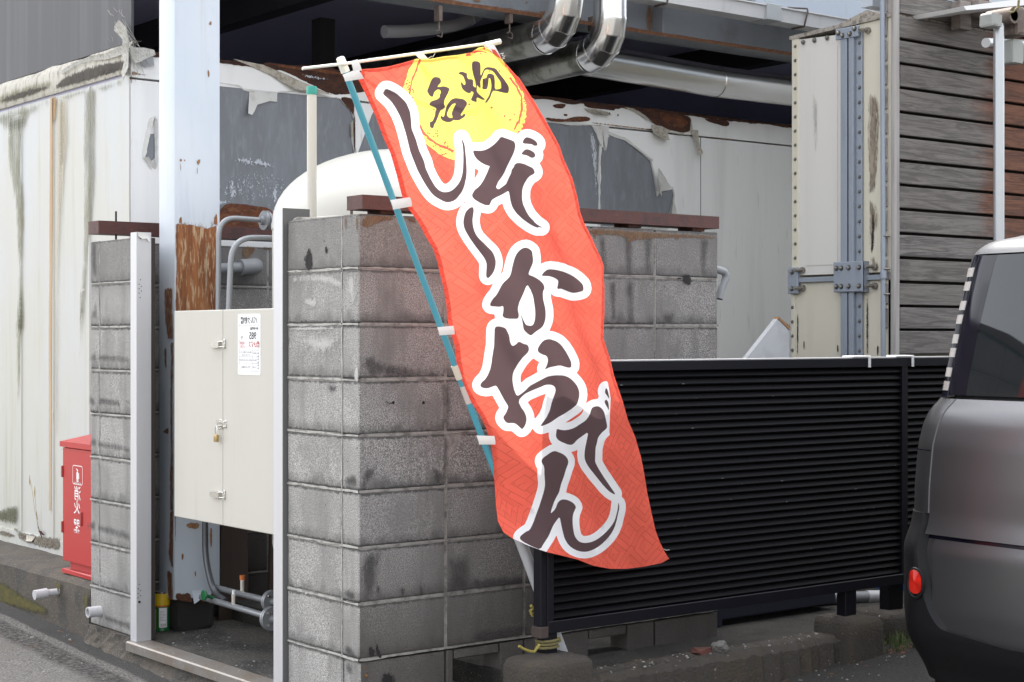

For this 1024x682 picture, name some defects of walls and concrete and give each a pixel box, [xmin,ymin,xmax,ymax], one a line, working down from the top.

water stain [2,59,124,102]
peeling [142,116,158,169]
peeling [220,82,388,212]
peeling [546,120,677,214]
corrosion [530,95,792,155]
corrosion [164,203,273,604]